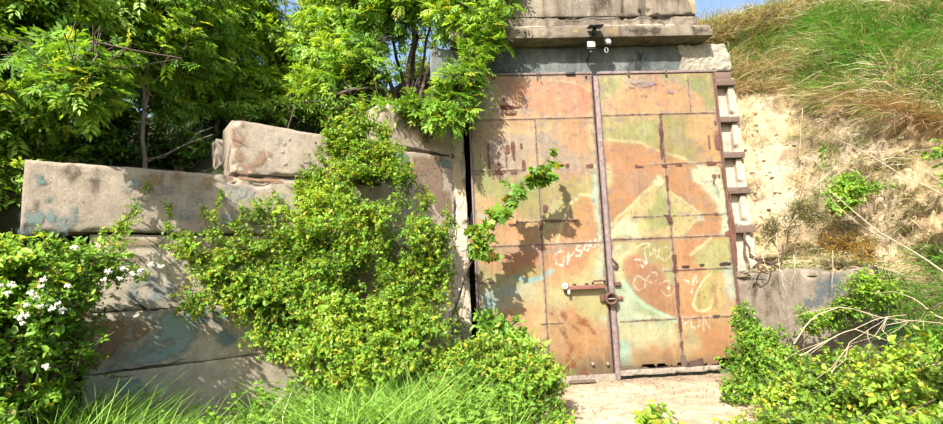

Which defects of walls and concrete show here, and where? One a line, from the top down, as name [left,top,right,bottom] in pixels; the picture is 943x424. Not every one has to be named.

corrosion [538,200,576,230]
corrosion [659,128,682,203]
corrosion [700,161,738,269]
corrosion [620,251,705,371]